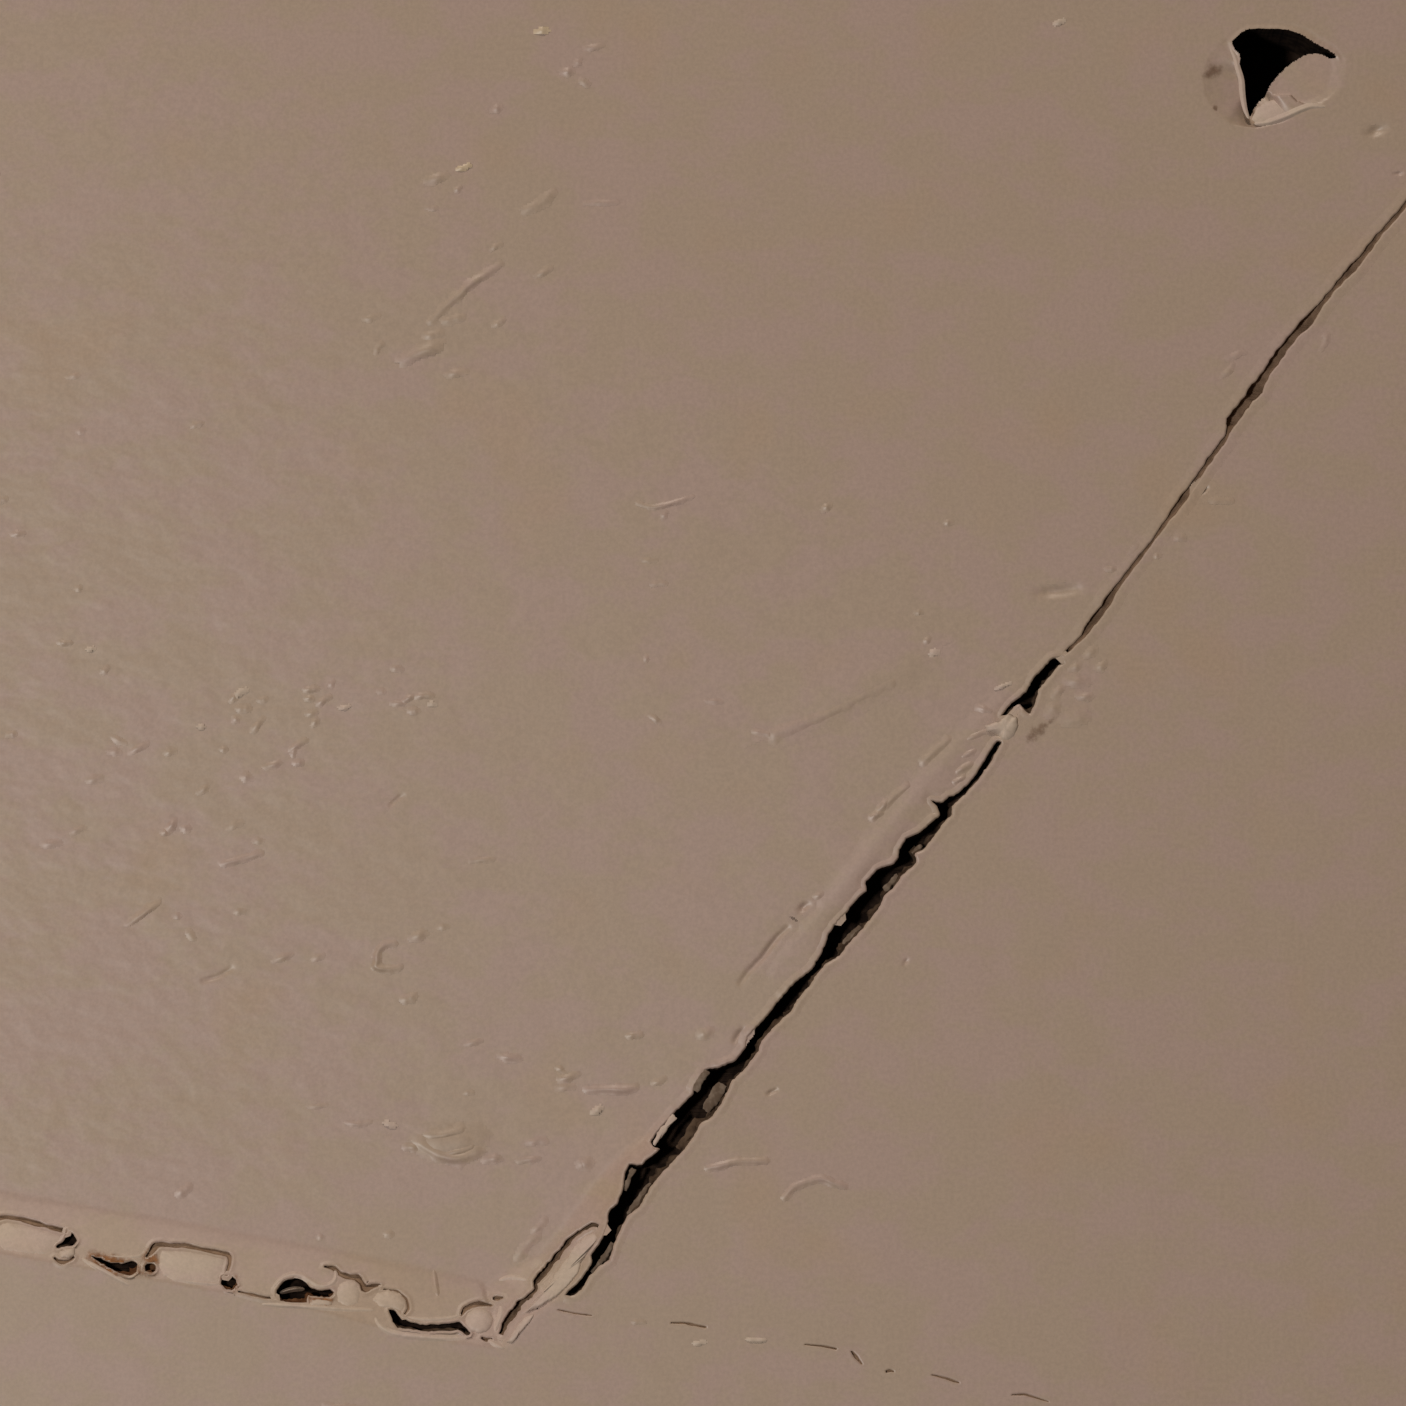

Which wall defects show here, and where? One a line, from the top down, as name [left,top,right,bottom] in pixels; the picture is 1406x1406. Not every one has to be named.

spalling [1195,13,1353,135]
crack [494,184,1406,1341]
crack [798,1338,965,1389]
crack [1005,1387,1054,1406]